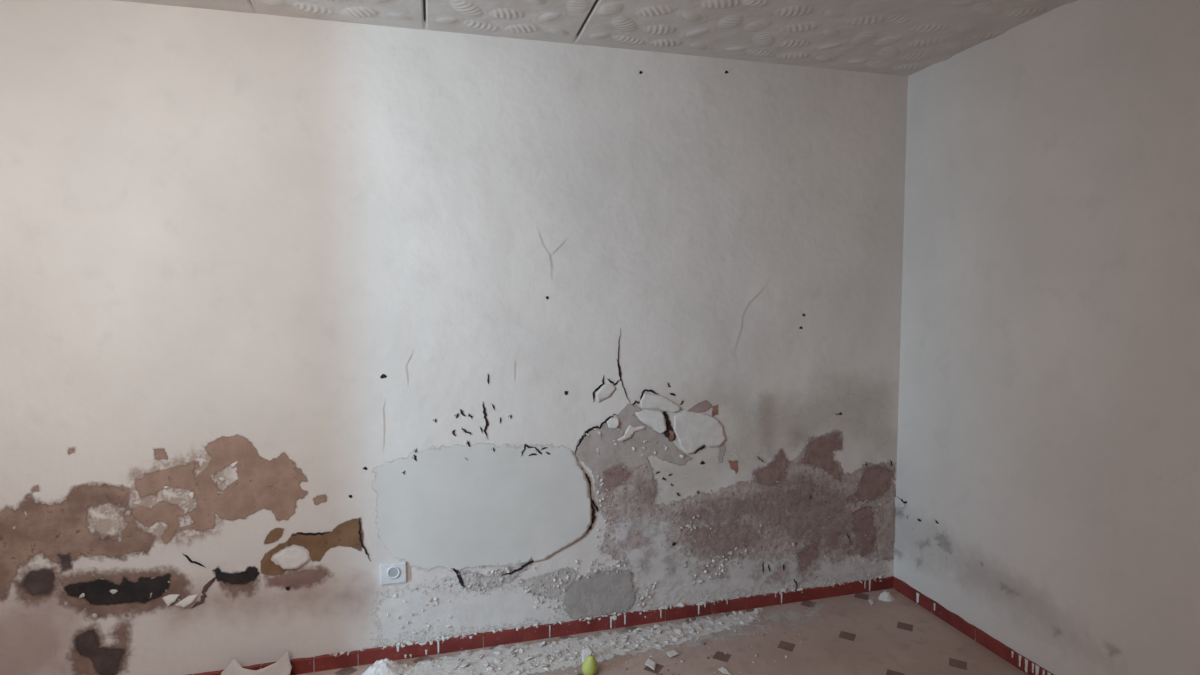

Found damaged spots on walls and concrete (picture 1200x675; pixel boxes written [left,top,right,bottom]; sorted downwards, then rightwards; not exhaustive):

crack [593,328,684,407]
peeling [575,393,726,496]
leakage [0,483,155,602]
peeling [59,435,371,619]
leakage [69,623,130,675]